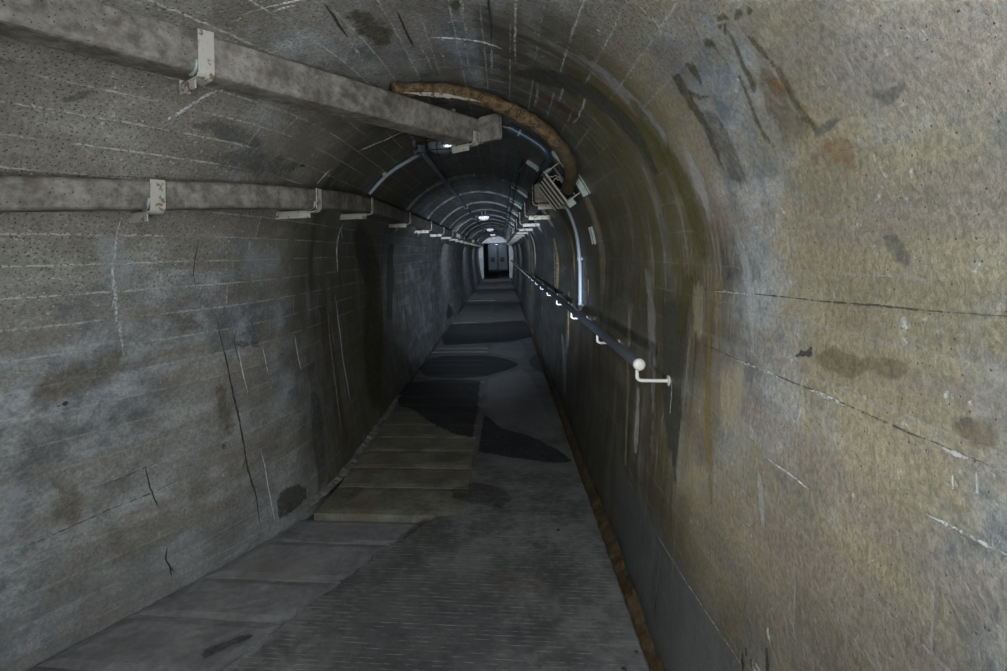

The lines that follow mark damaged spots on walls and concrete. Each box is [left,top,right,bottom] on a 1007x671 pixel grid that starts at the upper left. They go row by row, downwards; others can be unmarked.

damp [346,10,392,45]
damp [673,63,721,164]
damp [717,6,768,139]
damp [777,68,817,131]
crack [217,319,262,528]